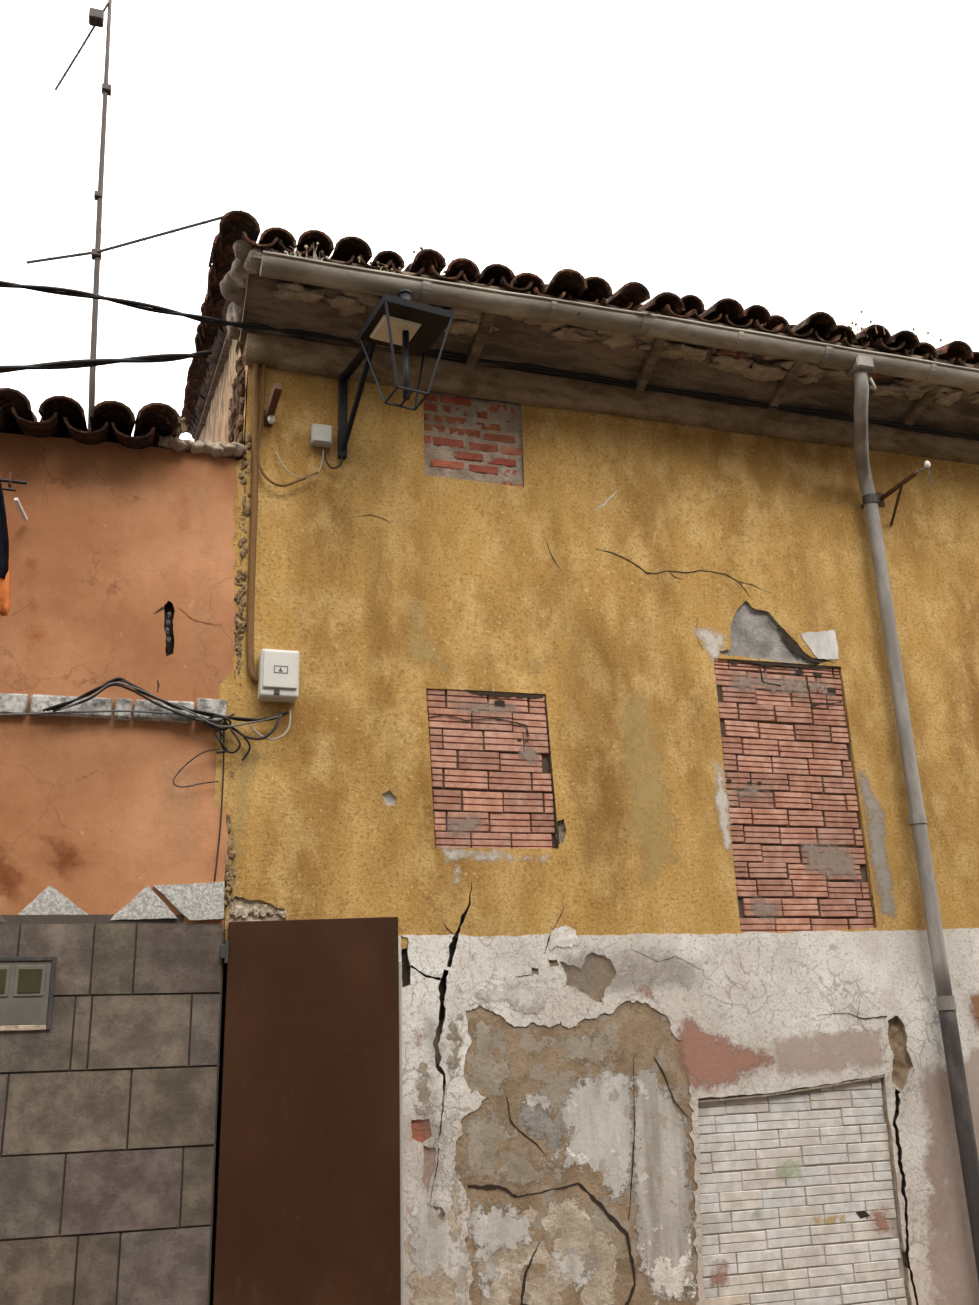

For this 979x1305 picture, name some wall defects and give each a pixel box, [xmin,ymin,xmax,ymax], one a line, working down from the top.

crack [598,549,770,597]
spalling [719,601,836,693]
crack [409,883,472,1205]
crack [515,906,565,977]
spalling [404,925,699,1305]
crack [468,1057,687,1305]
crack [893,1089,918,1305]